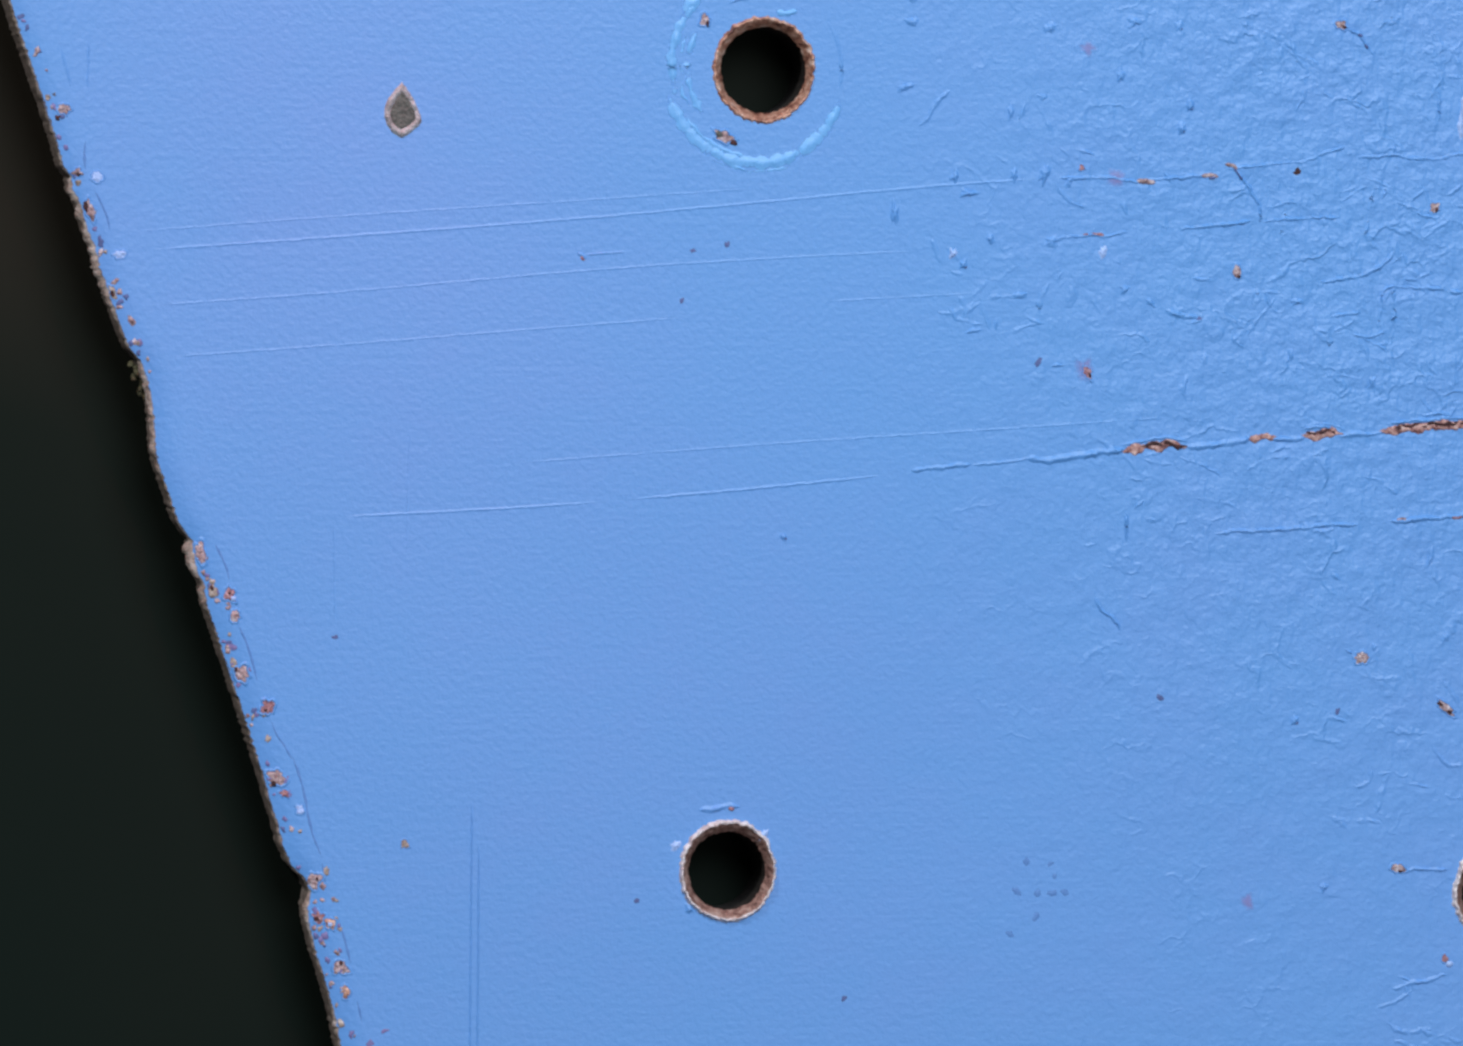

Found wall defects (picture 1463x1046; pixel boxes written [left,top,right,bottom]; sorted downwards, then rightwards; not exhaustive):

peeling [45,93,74,150]
peeling [70,166,128,260]
peeling [107,278,152,373]
crack [626,360,1463,536]
peeling [194,537,306,833]
peeling [400,838,411,850]
peeling [296,865,356,1039]